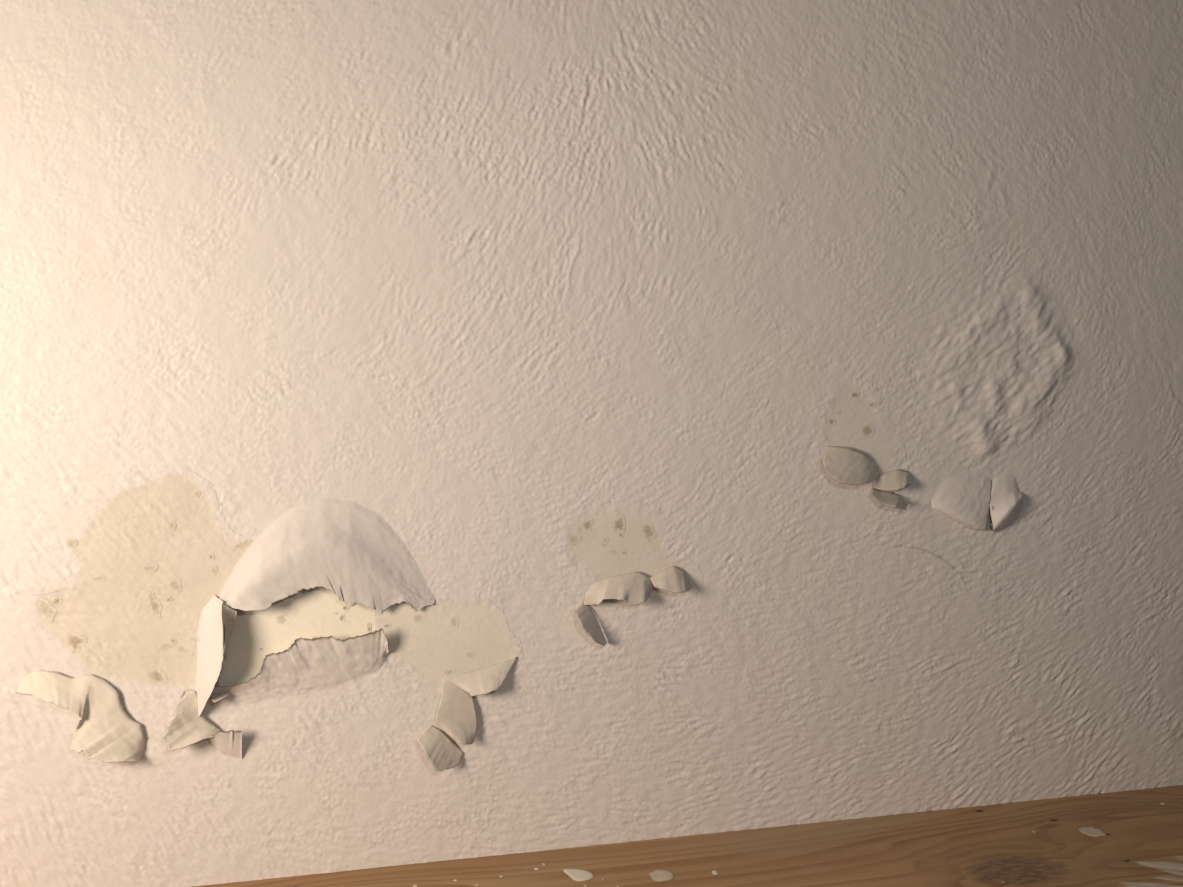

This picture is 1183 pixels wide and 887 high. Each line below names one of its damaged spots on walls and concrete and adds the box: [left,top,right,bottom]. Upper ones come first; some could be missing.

peeling [15,466,523,772]
peeling [556,499,703,646]
peeling [814,377,913,510]
peeling [931,469,1024,533]